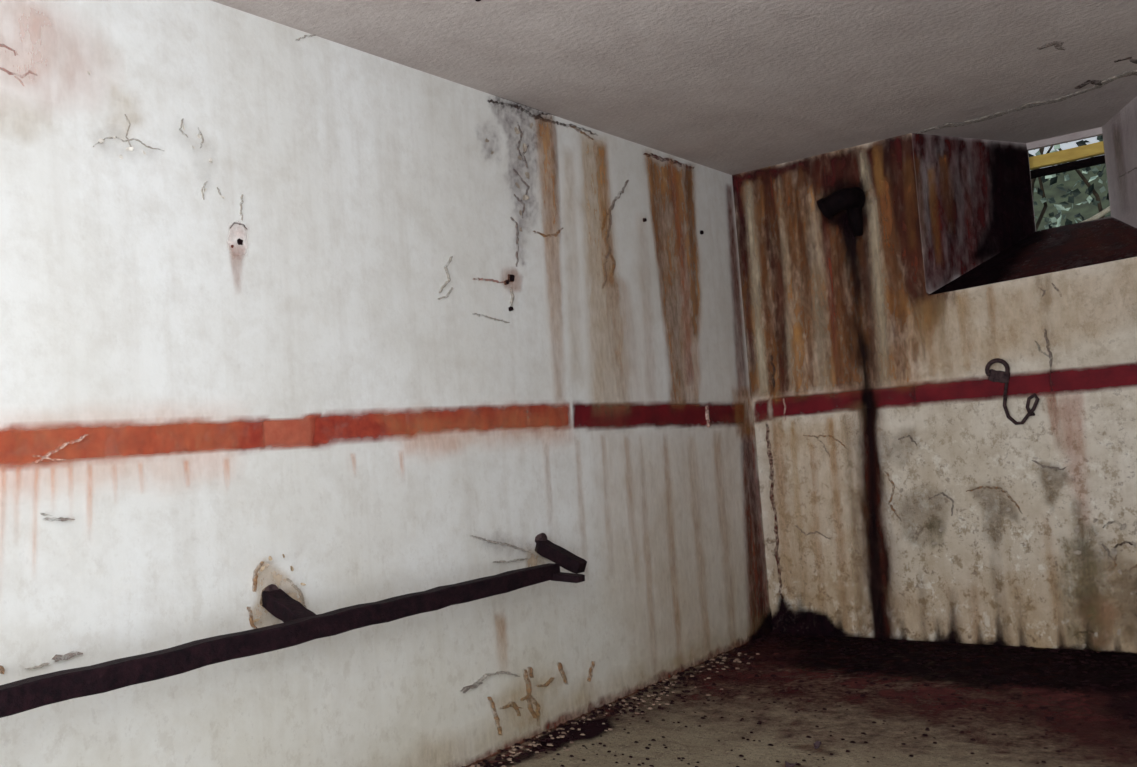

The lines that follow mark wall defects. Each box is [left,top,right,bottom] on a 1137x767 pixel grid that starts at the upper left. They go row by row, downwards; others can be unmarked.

crack [0,44,38,86]
water stain [498,103,546,267]
rust [533,122,560,241]
rust [643,153,700,403]
spalling [252,554,306,606]